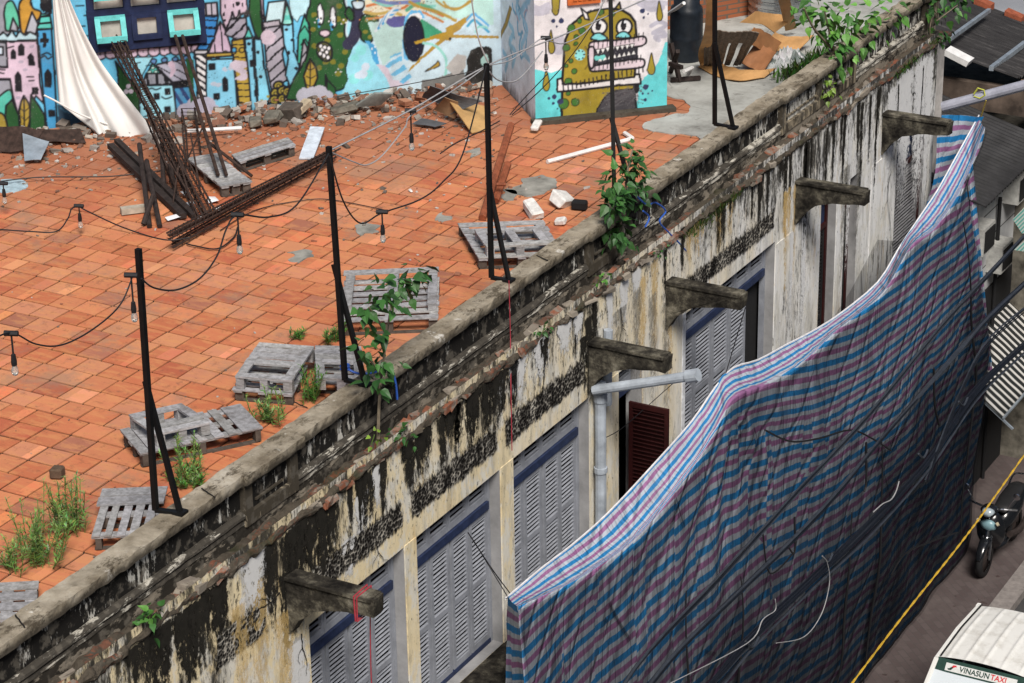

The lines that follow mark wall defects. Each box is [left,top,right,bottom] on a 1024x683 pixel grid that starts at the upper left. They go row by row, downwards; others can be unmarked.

damp [717,191,732,251]
damp [751,85,882,251]
peeling [726,54,934,228]
spalling [390,377,471,452]
damp [400,359,519,495]
damp [534,301,598,406]
damp [262,459,387,665]
damp [124,578,229,683]